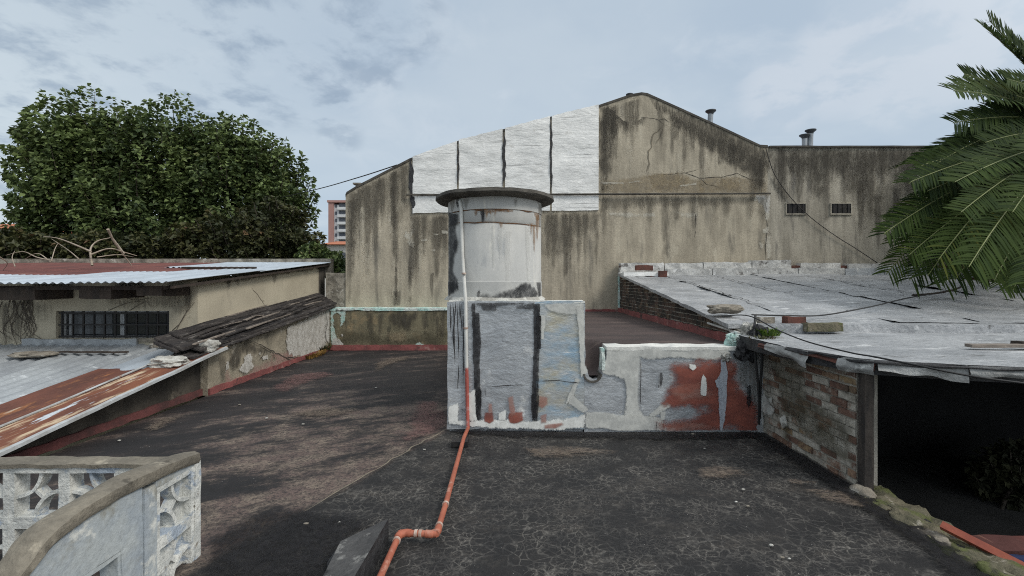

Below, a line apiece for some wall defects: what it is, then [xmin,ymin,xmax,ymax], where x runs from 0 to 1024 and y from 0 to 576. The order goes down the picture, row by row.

crack [599,117,770,252]
water stain [656,103,917,195]
flaking render [225,310,345,382]